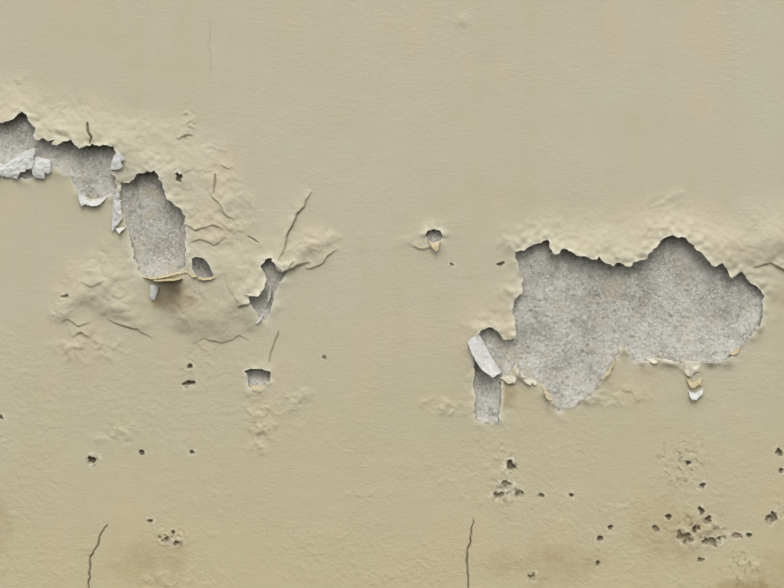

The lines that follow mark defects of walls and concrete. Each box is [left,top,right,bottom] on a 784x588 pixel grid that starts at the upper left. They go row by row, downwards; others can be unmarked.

peeling [0,107,220,300]
crack [246,189,319,263]
peeling [420,223,447,252]
peeling [242,253,294,328]
peeling [467,229,770,429]
peeling [241,363,278,394]
crack [82,522,112,588]
crack [459,518,478,588]